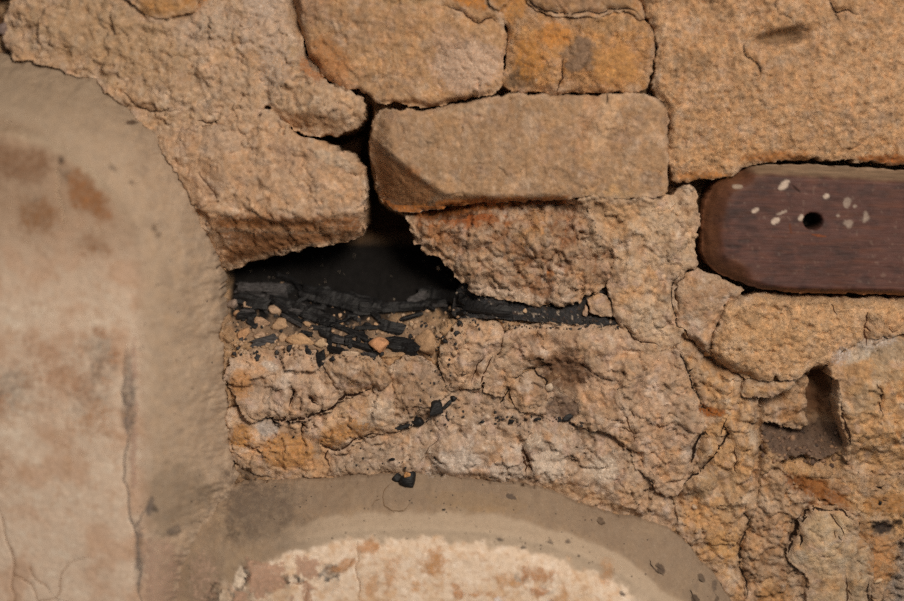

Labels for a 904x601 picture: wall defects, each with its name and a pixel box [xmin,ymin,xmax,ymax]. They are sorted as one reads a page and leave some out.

spalling [404,198,615,309]
crack [121,345,150,601]
crack [247,387,378,466]
crack [0,511,81,601]